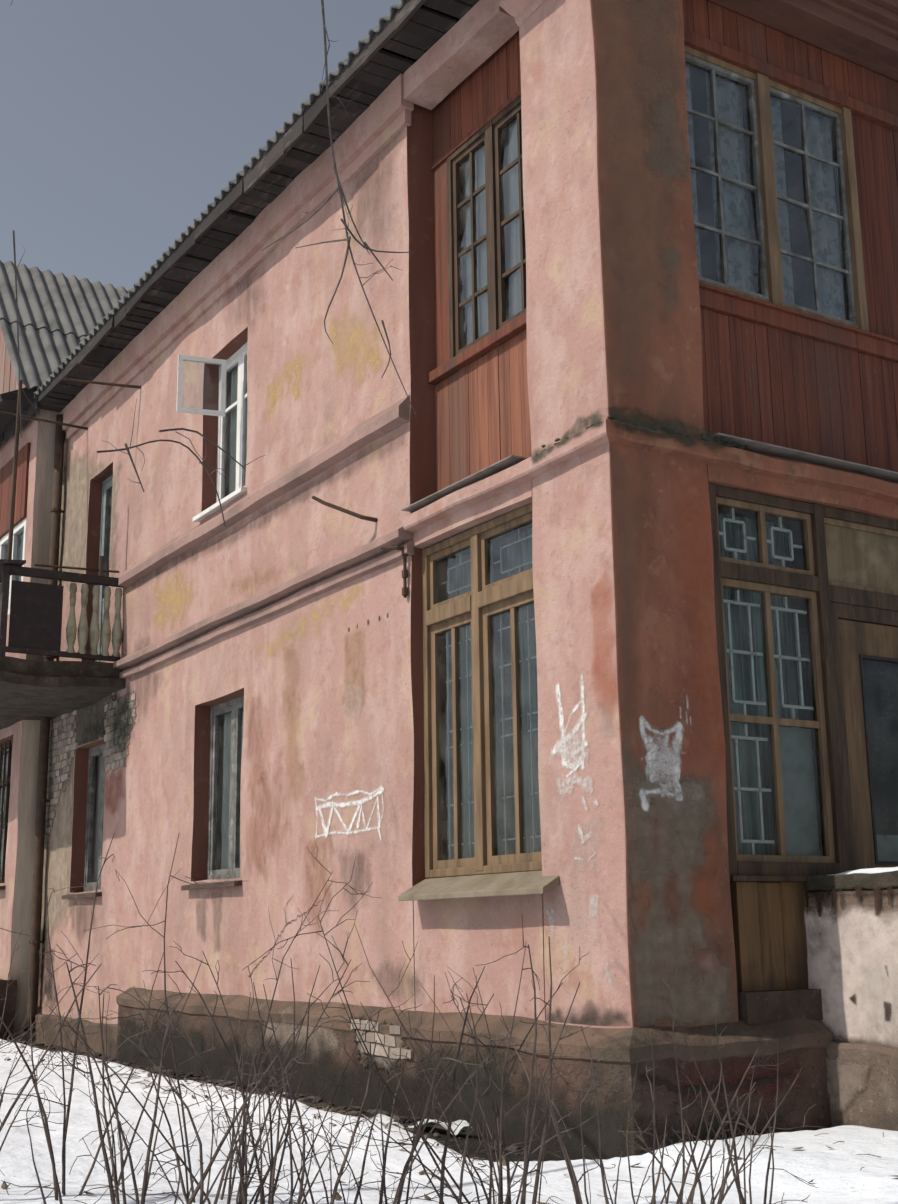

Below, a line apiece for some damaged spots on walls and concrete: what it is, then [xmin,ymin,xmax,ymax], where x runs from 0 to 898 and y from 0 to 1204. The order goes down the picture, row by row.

flaking render [45,691,136,843]
crack [248,882,332,977]
damp [805,885,898,916]
flaking render [265,1012,337,1059]
flaking render [349,1015,414,1074]
damp [551,1010,623,1026]
damp [117,1019,780,1161]